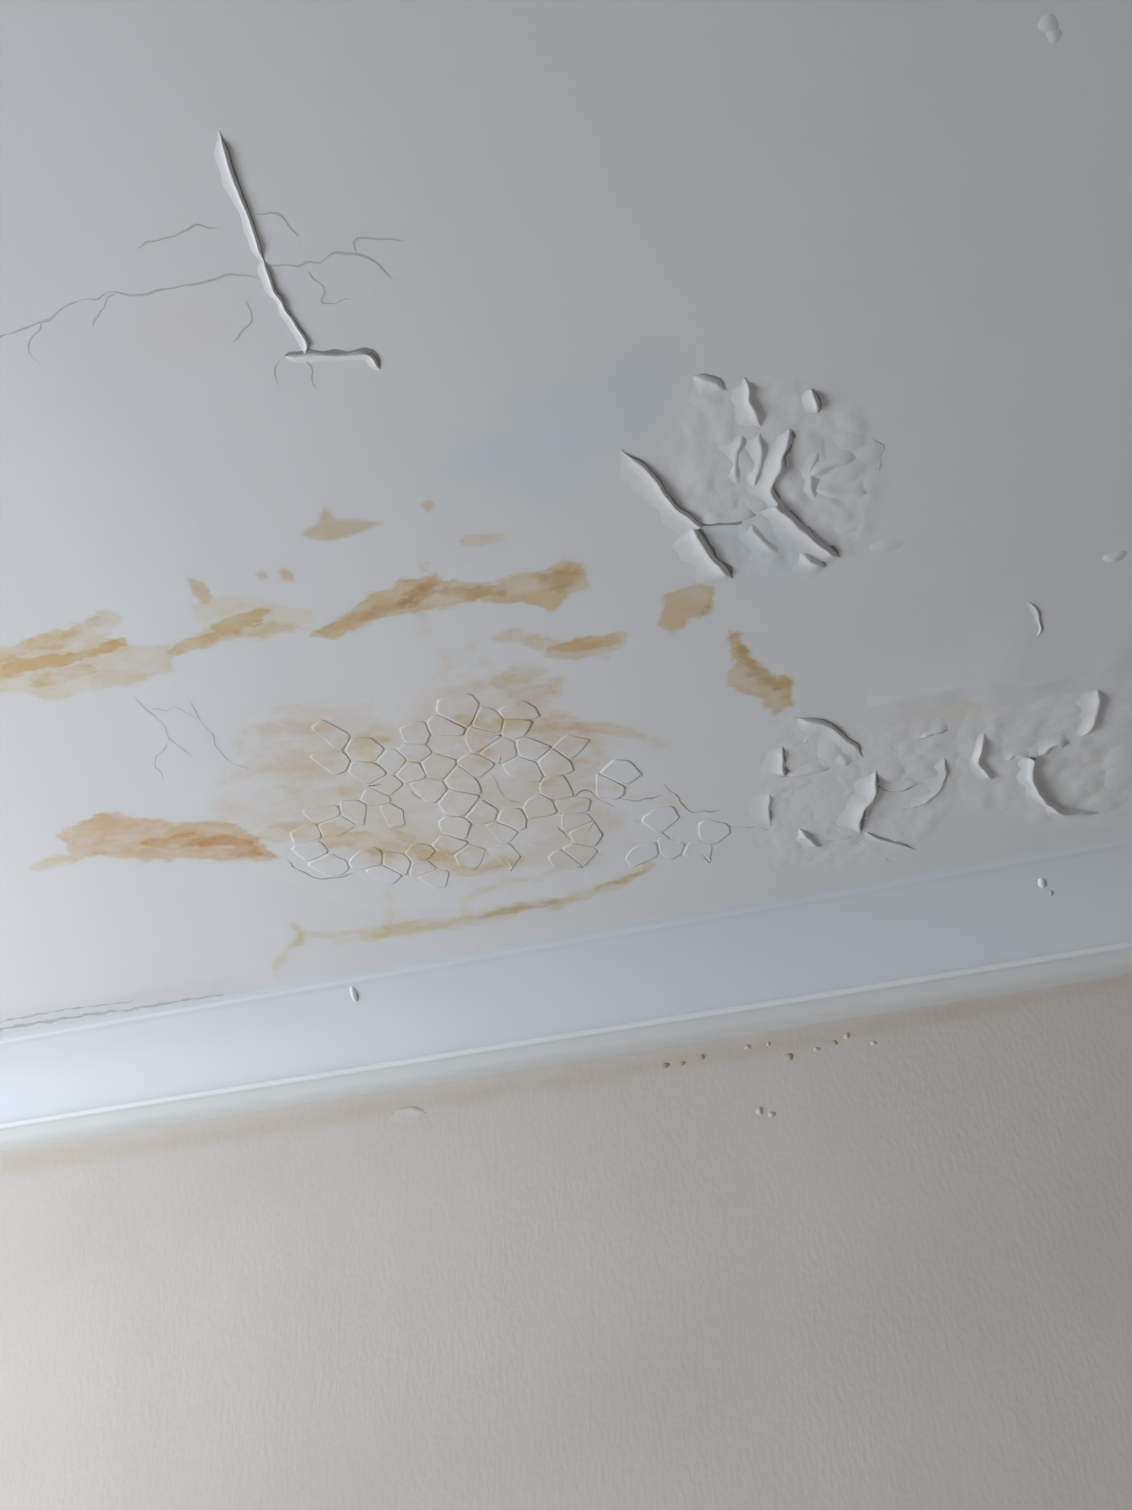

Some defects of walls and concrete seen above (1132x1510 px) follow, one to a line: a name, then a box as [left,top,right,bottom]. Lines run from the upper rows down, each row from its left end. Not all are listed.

crack [0,131,399,389]